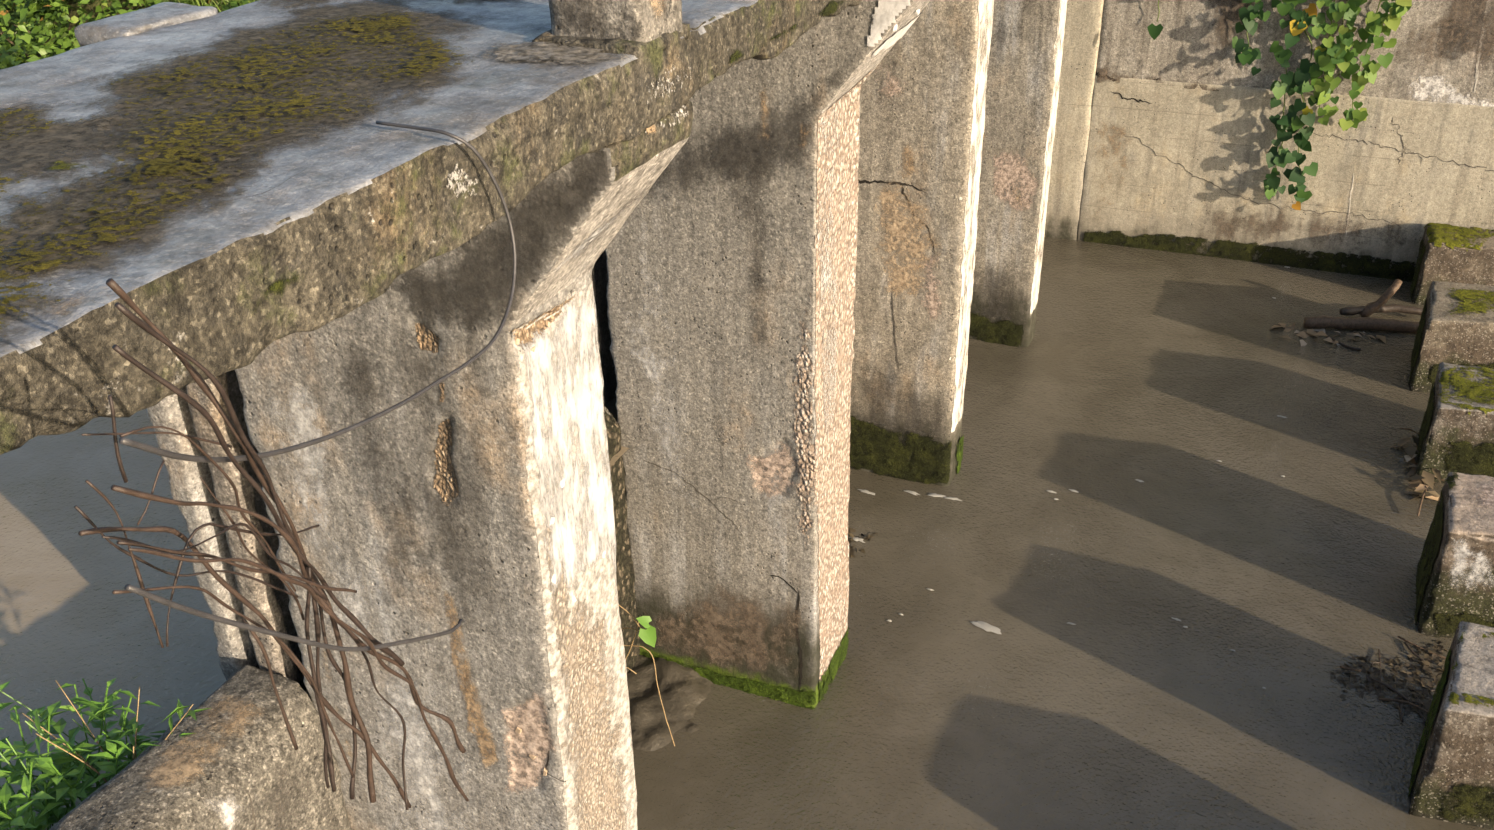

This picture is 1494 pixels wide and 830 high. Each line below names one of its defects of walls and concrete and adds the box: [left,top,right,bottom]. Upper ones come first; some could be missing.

damp [1095,68,1161,83]
damp [1215,0,1250,46]
damp [1396,0,1494,106]
damp [651,97,817,214]
crack [1096,71,1494,235]
crack [858,180,935,254]
damp [1209,208,1403,248]
spalling [747,0,923,682]
damp [658,585,801,669]